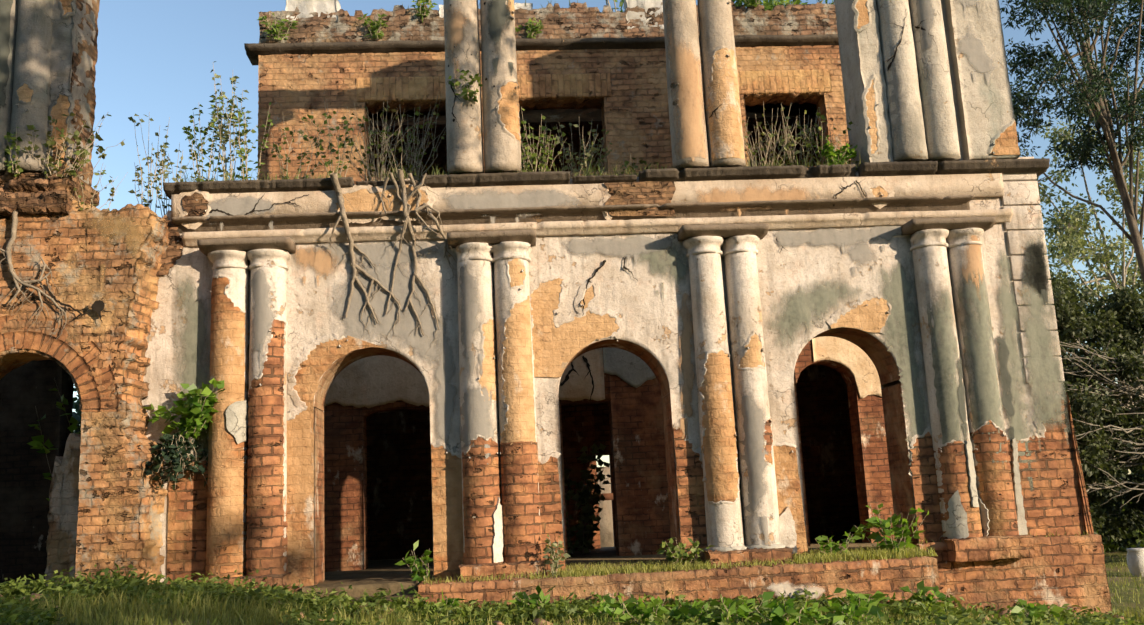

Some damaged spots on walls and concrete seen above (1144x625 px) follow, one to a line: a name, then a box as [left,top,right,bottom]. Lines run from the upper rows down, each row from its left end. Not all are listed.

crack [887,13,938,70]
flaking render [46,92,75,173]
flaking render [485,78,521,143]
flaking render [704,45,745,161]
flaking render [987,119,1020,155]
crack [200,193,308,216]
crack [578,257,638,316]
flaking render [826,290,892,334]
flaking render [167,272,384,586]
flaking render [431,258,626,580]
flaking render [673,329,766,564]
flaking render [908,393,1085,544]